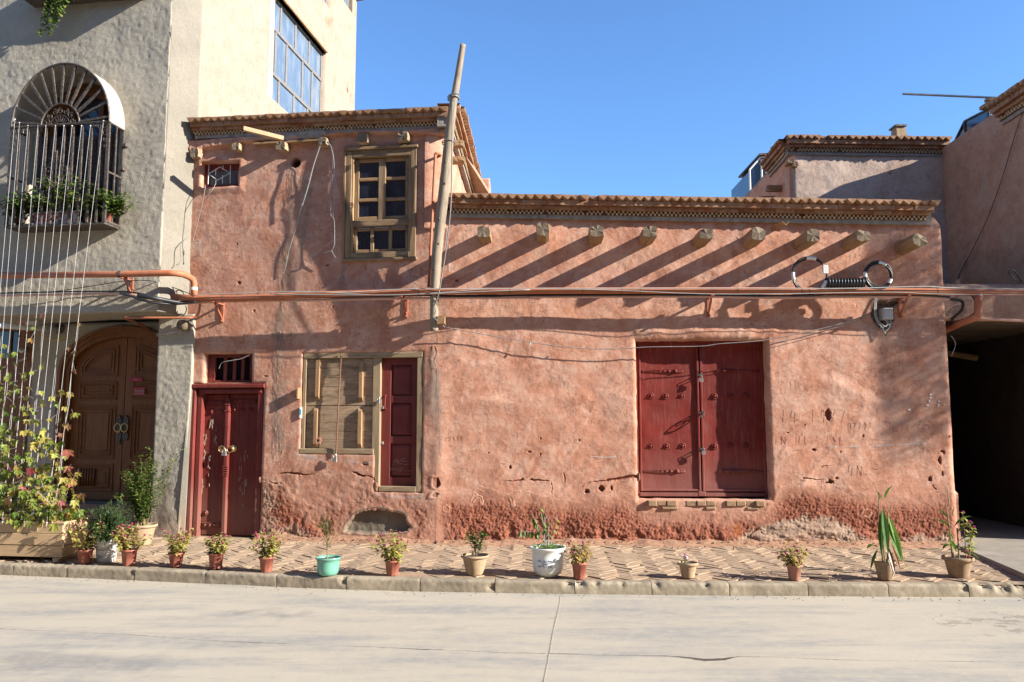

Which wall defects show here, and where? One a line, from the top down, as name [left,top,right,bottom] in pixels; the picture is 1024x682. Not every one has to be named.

crack [258,168,317,503]
crack [452,467,640,508]
flaking render [259,476,962,544]